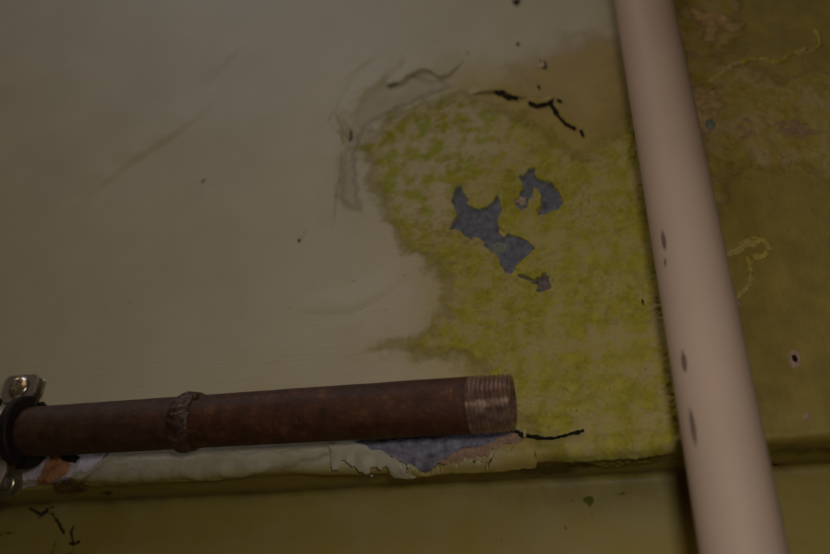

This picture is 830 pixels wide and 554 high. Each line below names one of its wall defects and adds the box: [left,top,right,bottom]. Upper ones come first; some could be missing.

damp [677,0,830,205]
peeling [513,169,563,215]
peeling [450,187,552,292]
damp [360,41,684,467]
spalling [22,453,107,494]
spalling [328,428,537,479]
crack [511,429,584,440]
crack [29,506,80,554]